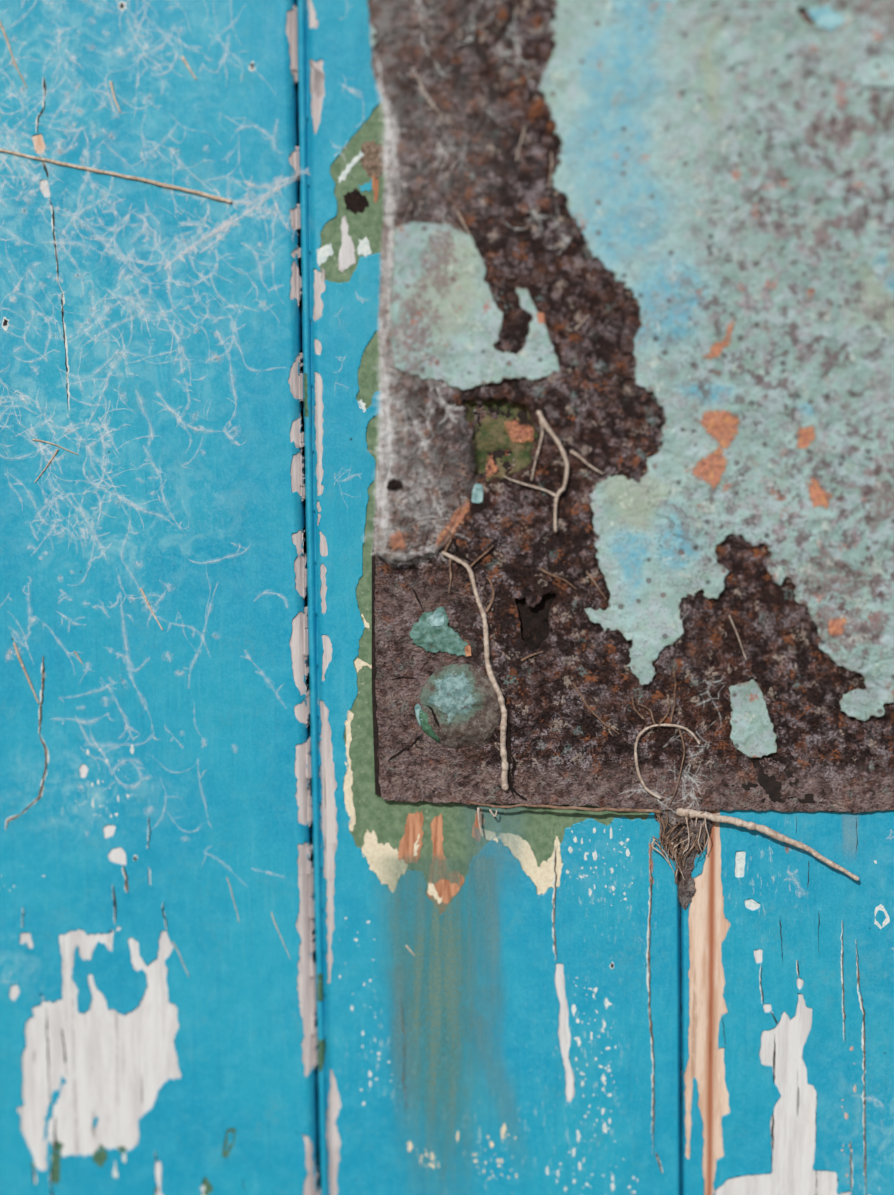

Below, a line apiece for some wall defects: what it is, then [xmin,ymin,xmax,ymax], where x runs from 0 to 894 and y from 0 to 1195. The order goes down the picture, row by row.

peeling [286,0,325,134]
peeling [807,3,846,31]
peeling [853,54,894,88]
peeling [289,101,386,322]
corrosion [367,0,894,813]
peeling [288,331,650,1195]
peeling [9,985,20,1001]
peeling [17,926,181,1185]
peeling [684,809,852,1195]